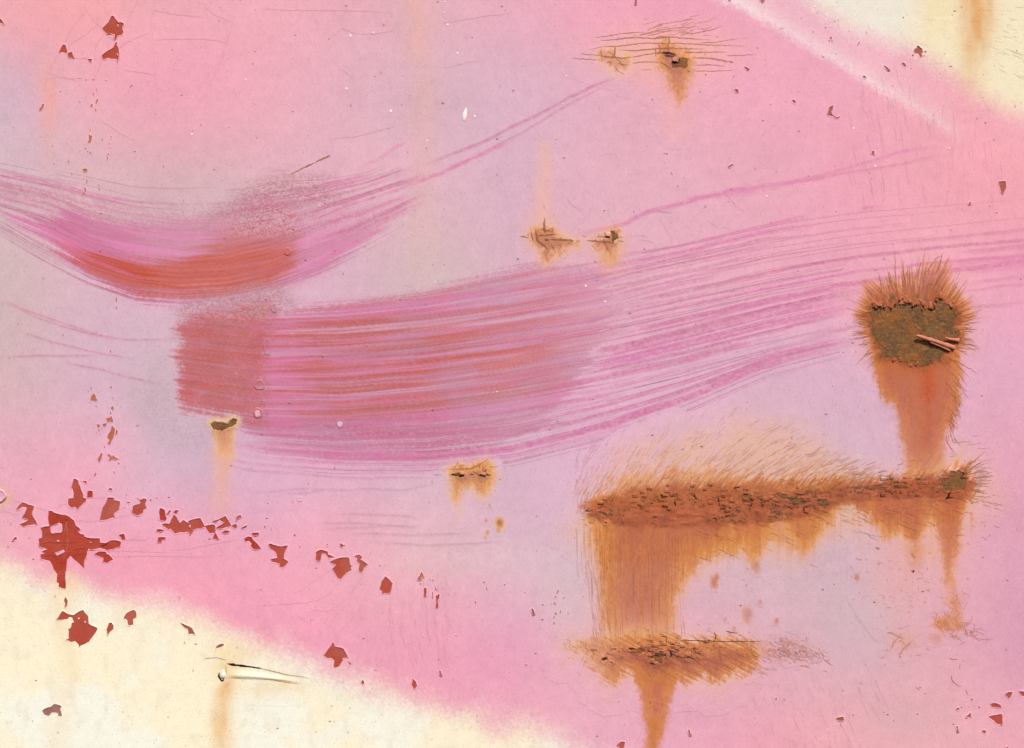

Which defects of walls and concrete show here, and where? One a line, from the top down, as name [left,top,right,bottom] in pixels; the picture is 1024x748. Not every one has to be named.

peeling [58,15,125,65]
rust [560,10,789,114]
rust [508,204,641,283]
peeling [12,385,301,648]
rust [200,412,246,525]
rust [433,450,508,542]
rust [536,239,1017,748]
peeling [314,543,394,595]
peeling [417,571,450,609]
peeling [323,641,351,670]